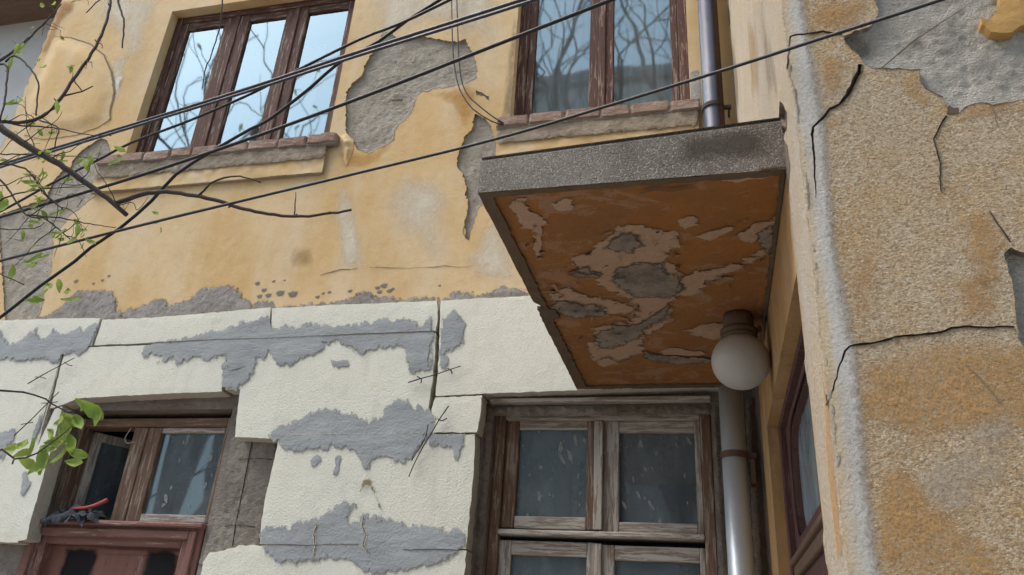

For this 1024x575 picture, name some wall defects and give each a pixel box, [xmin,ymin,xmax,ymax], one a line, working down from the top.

flaking render [345,31,489,153]
spalling [457,70,702,240]
crack [786,30,842,71]
crack [810,7,965,198]
spalling [844,0,1024,117]
flaking render [0,138,326,321]
peeling [508,198,555,263]
crack [990,211,1011,242]
peeling [537,216,779,367]
spalling [1003,248,1024,346]
crack [825,325,1015,406]